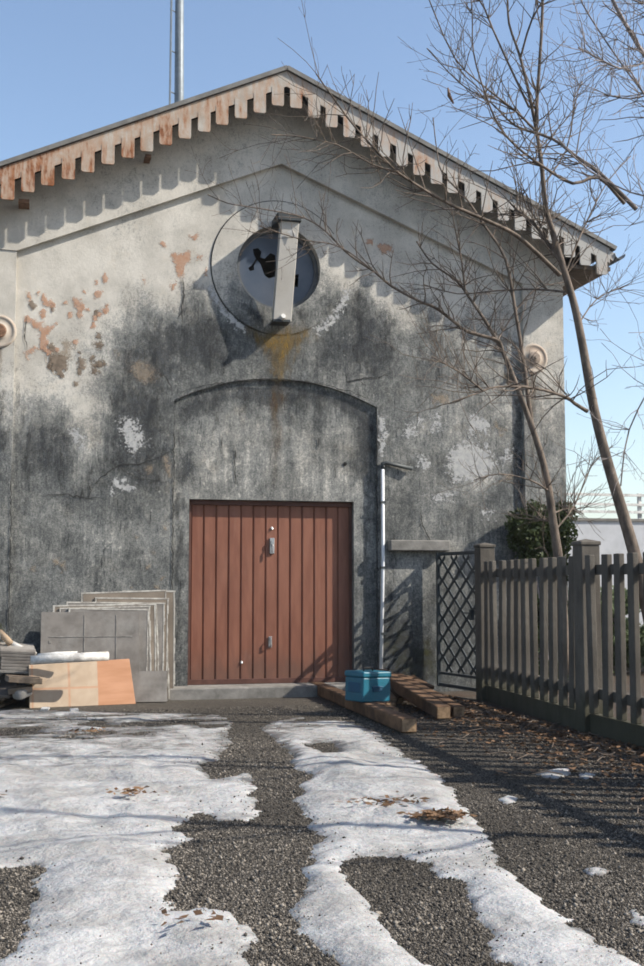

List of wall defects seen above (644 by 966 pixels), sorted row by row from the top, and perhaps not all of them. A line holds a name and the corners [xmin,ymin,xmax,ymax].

flaking render [160,234,246,334]
flaking render [24,273,109,386]
flaking render [130,361,162,382]
spalling [66,426,87,450]
spalling [115,415,154,459]
spalling [110,477,138,496]